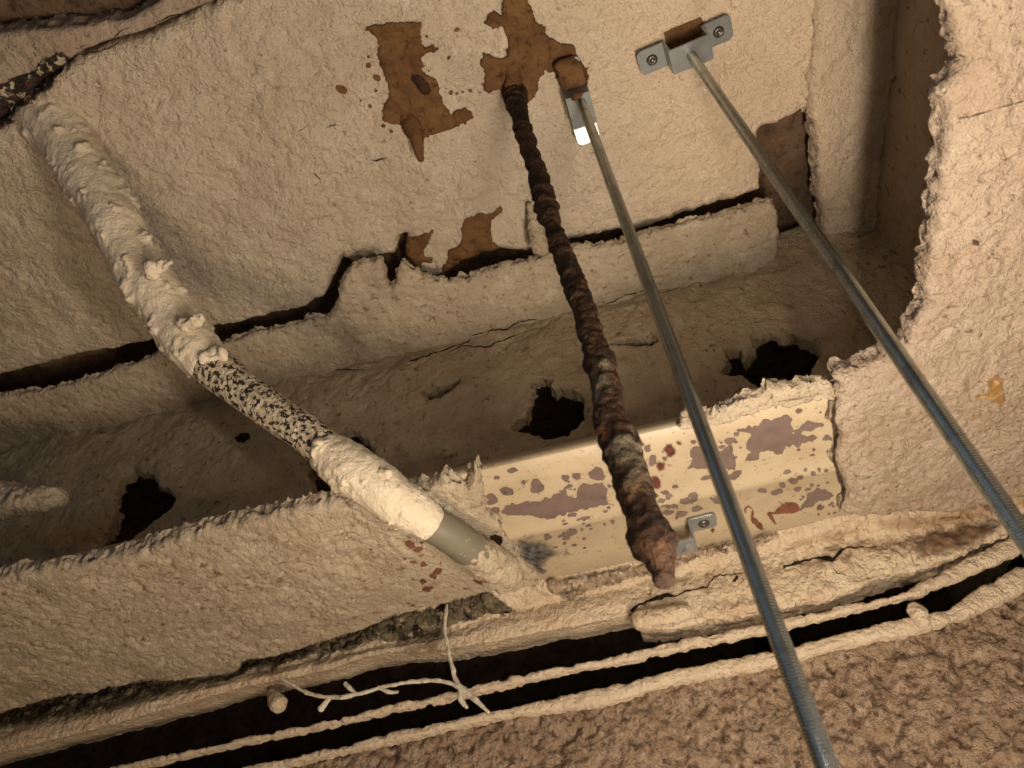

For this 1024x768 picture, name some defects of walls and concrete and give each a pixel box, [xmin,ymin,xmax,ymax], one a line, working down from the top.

rust [360,0,589,162]
rust [405,206,503,276]
crack [599,288,679,308]
crack [409,319,536,362]
rust [653,442,681,489]
peeling [718,408,832,480]
peeling [486,466,615,549]
peeling [656,484,720,519]
peeling [757,468,837,516]
spalling [546,564,652,600]
crack [630,573,744,612]
crack [783,546,878,574]